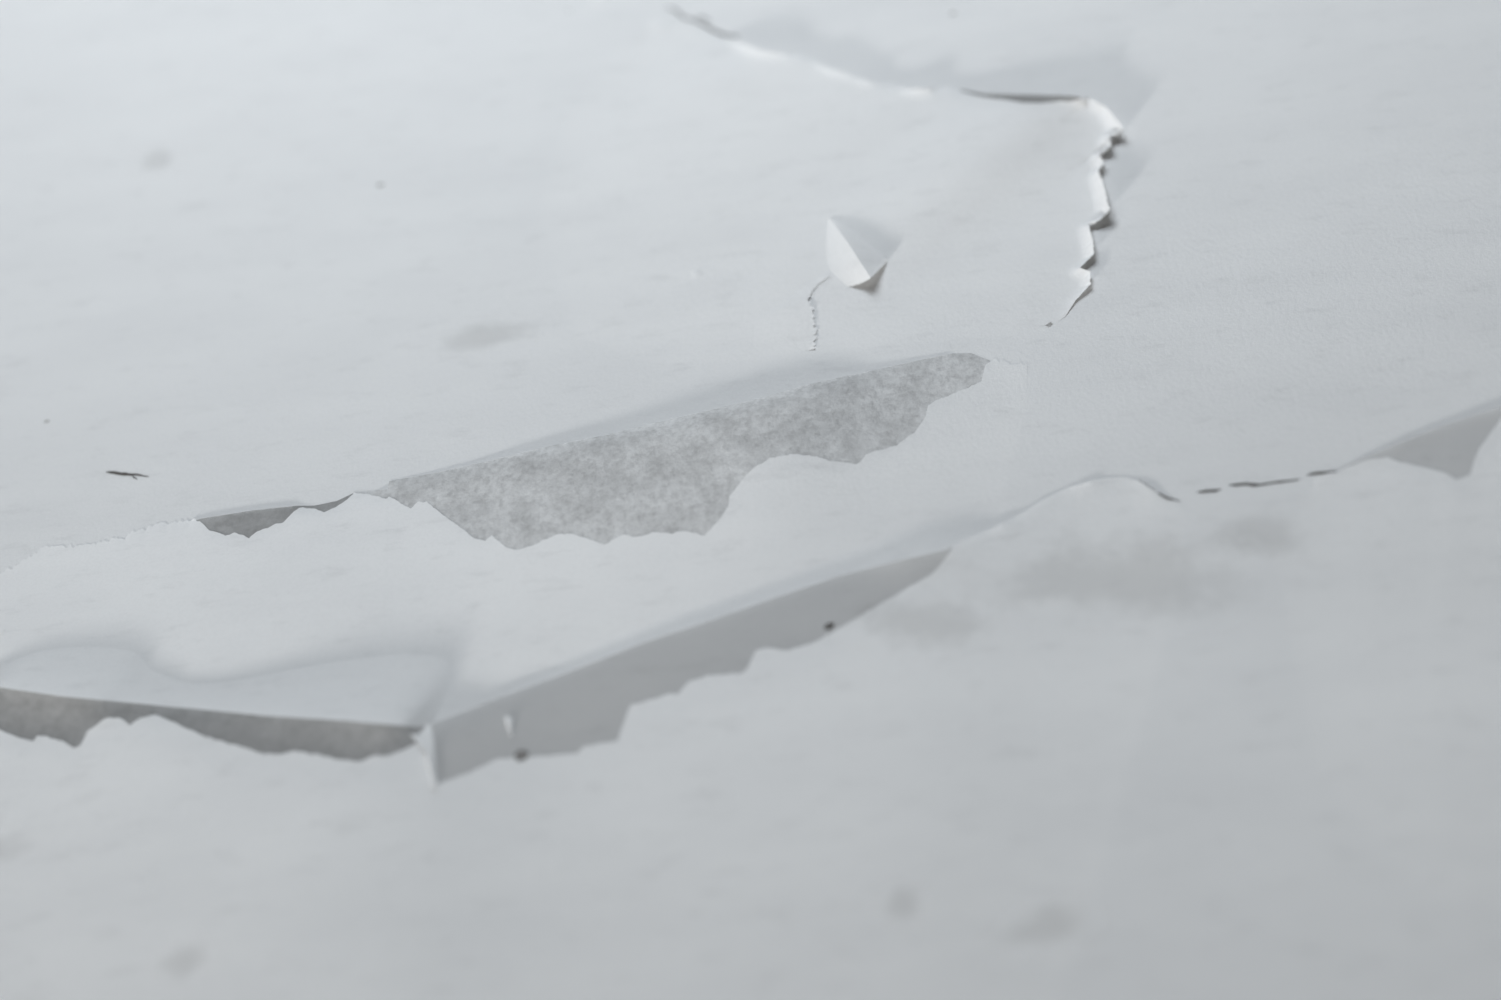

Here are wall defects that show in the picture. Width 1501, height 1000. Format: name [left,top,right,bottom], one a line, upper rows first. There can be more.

peeling [558,18,1123,344]
peeling [0,353,1185,1000]